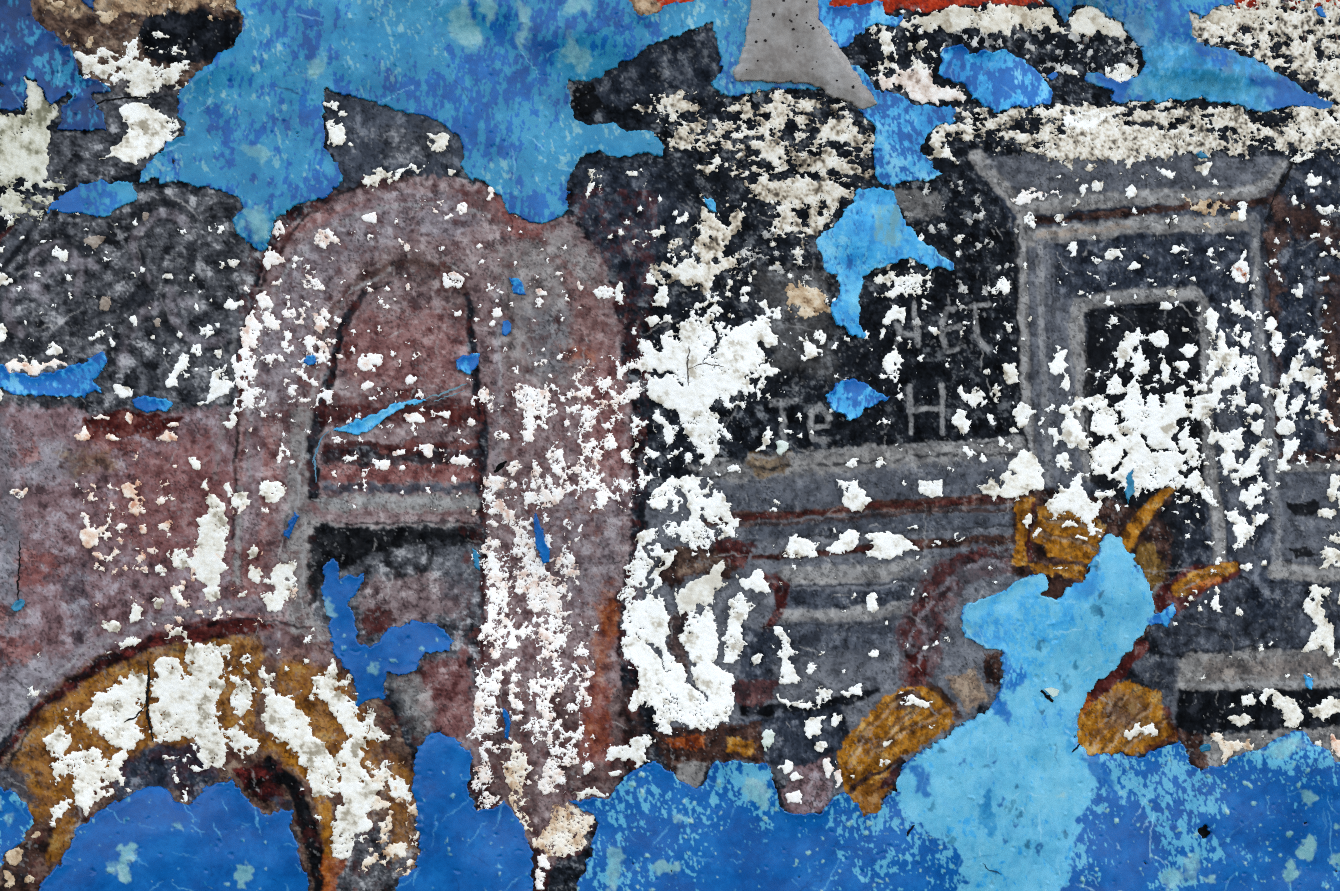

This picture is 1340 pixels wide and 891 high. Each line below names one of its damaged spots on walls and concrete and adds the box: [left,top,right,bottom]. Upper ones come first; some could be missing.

spalling [44,0,75,13]
spalling [65,0,190,165]
spalling [0,76,149,314]
peeling [0,323,8,342]
peeling [4,320,68,376]
peeling [74,88,1029,891]
crack [124,660,154,742]
spalling [3,457,420,888]
peeling [1040,687,1059,702]
peeling [1124,722,1158,740]
peeling [1200,673,1340,765]